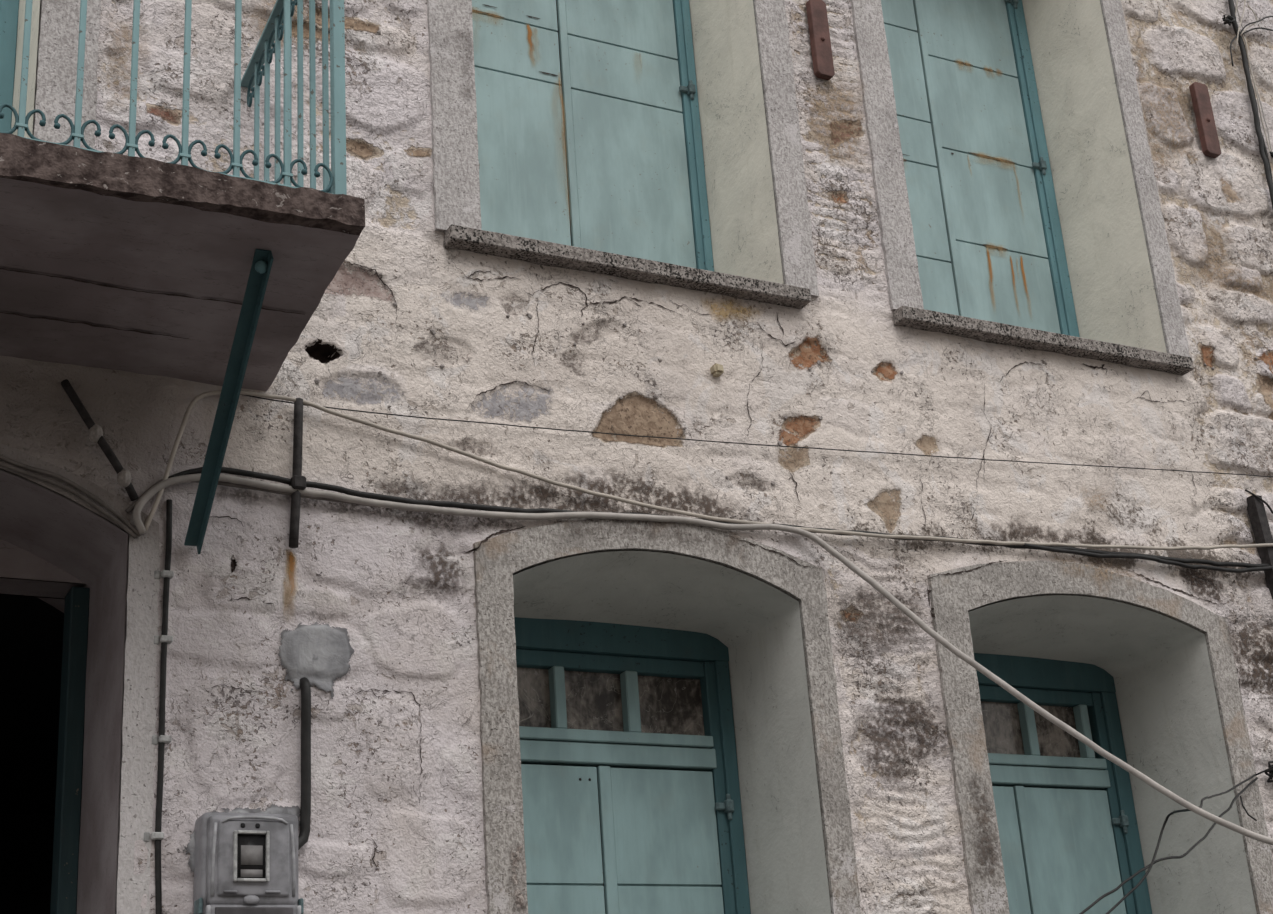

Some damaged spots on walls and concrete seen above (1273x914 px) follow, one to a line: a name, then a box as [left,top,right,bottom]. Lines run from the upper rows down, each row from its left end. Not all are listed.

rust [526,15,540,57]
rust [982,244,1028,295]
spalling [305,338,343,363]
spalling [314,371,403,408]
crack [453,262,711,406]
spalling [789,336,828,370]
spalling [871,363,904,381]
spalling [592,394,687,447]
spalling [778,415,823,469]